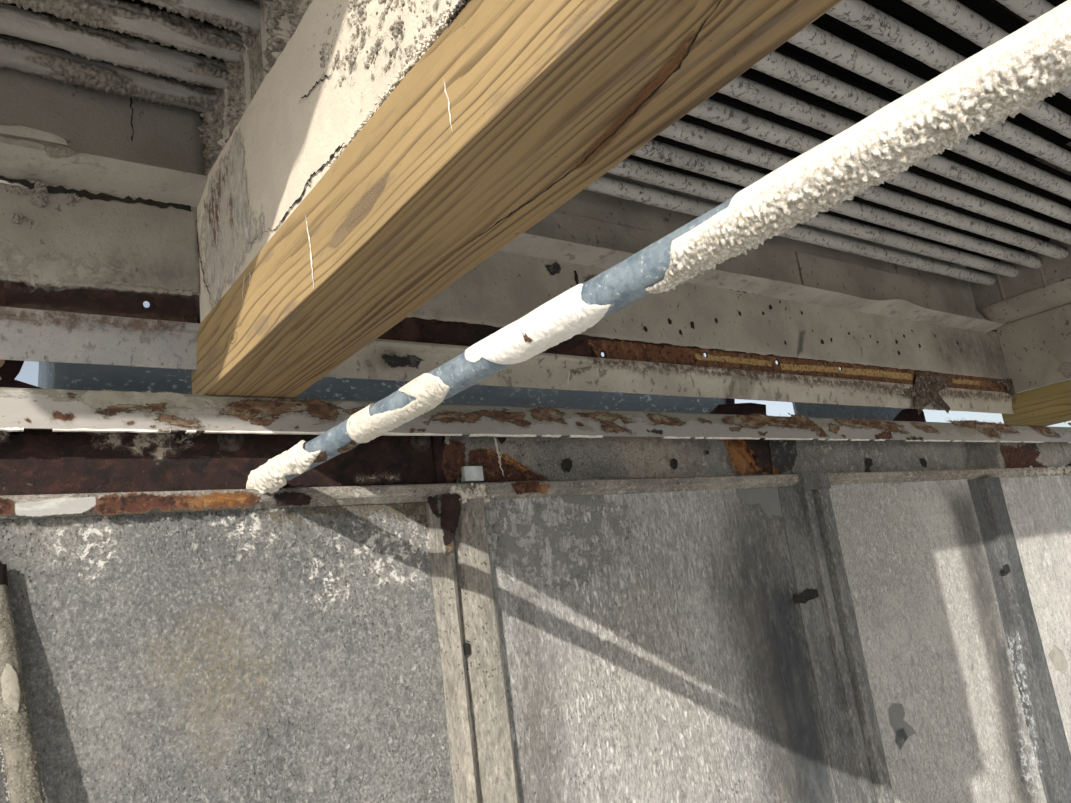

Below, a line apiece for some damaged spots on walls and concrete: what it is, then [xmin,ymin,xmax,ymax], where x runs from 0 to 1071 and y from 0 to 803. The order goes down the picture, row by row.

crack [298,72,332,104]
crack [128,97,136,141]
crack [249,112,371,244]
peeling [204,164,234,246]
corrosion [0,279,197,331]
corrosion [421,321,503,346]
corrosion [542,337,1015,401]
corrosion [0,411,318,516]
corrosion [574,412,663,435]
corrosion [724,438,780,475]
corrosion [1000,425,1061,468]
corrosion [274,435,549,556]